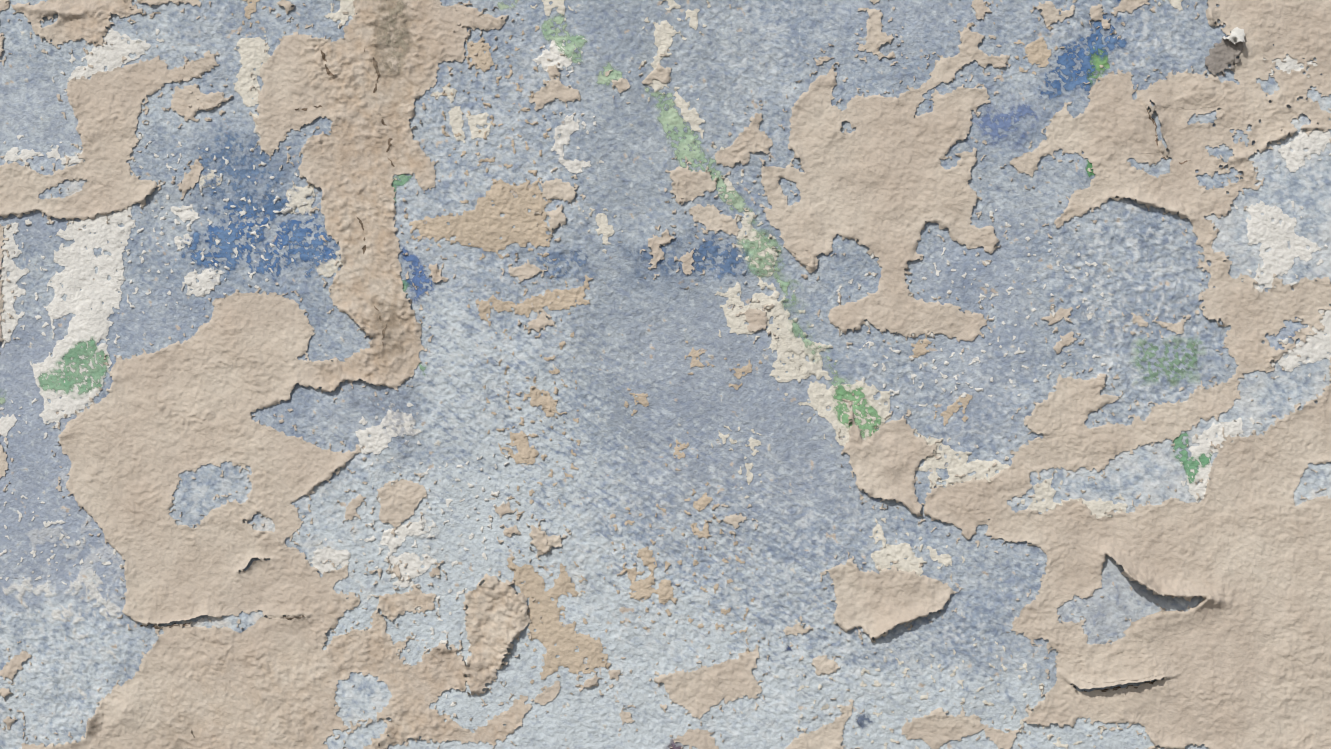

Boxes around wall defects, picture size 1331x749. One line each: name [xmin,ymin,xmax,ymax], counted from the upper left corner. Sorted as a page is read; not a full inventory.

peeling [0,0,638,749]
peeling [640,0,1331,749]